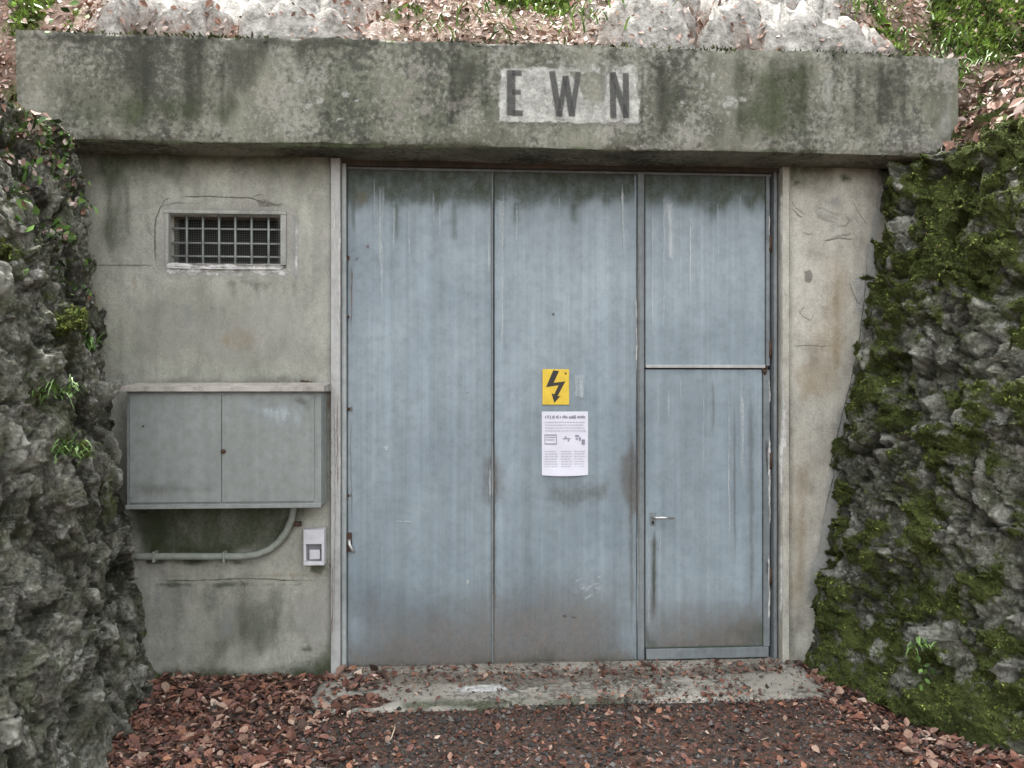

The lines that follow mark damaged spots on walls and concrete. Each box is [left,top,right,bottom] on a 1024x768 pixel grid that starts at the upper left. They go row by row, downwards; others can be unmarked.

crack [174,578,285,586]
damp [272,658,330,677]